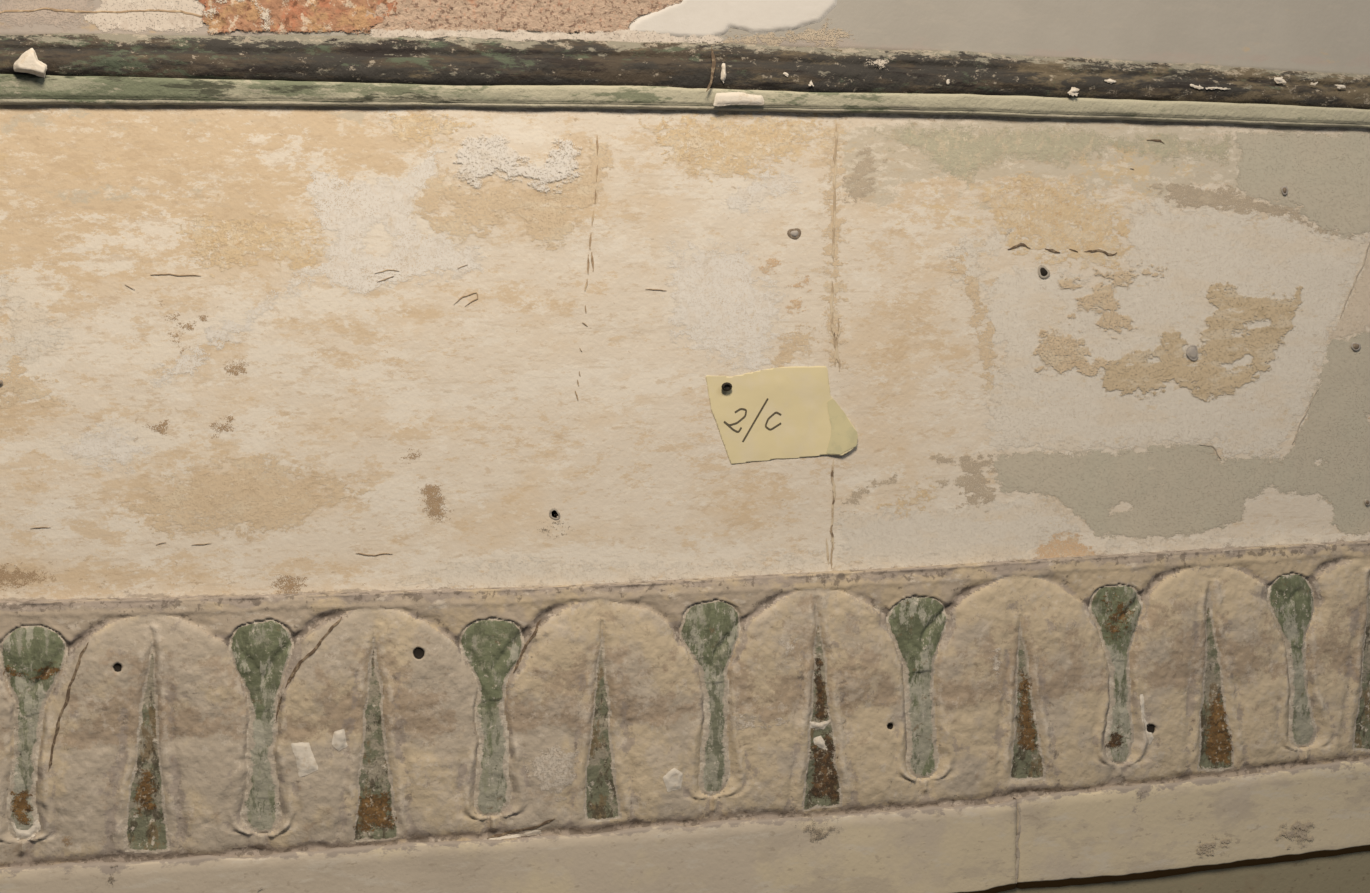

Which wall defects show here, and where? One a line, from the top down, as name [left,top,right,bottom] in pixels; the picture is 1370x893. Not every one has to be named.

crack [575,136,599,400]
peeling [638,110,1370,402]
peeling [395,548,828,590]
peeling [930,331,1370,559]